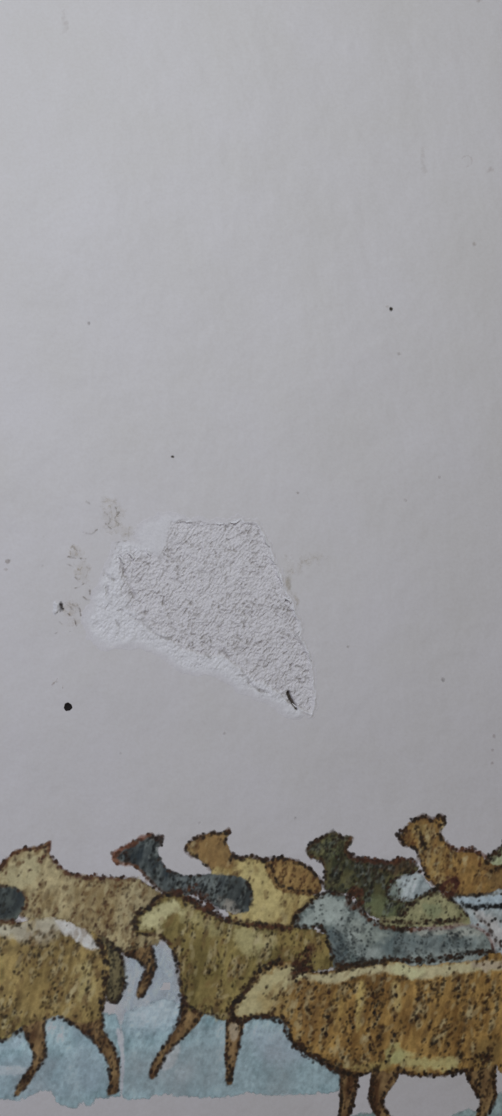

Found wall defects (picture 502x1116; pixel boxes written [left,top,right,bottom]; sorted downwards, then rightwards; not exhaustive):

peeling [81,511,319,720]